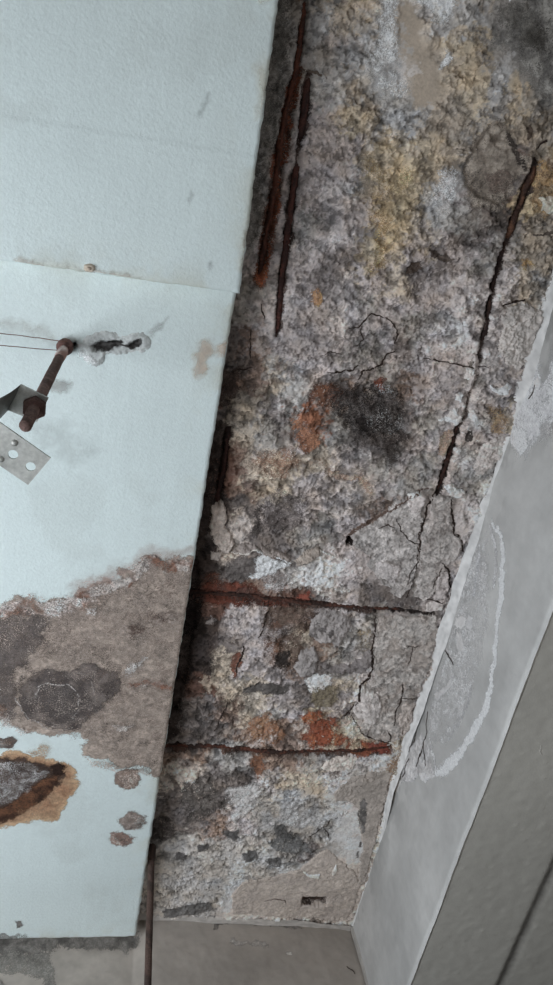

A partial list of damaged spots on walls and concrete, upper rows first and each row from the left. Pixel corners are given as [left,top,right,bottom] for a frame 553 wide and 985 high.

rust [252,66,304,289]
spalling [260,1,312,337]
spalling [462,122,553,215]
leakage [218,368,241,408]
crack [322,313,399,380]
leakage [324,380,410,467]
leakage [0,420,234,829]
rust [190,572,310,608]
peeling [172,232,543,922]
crack [347,488,464,604]
rust [300,685,401,781]
crack [343,616,428,777]